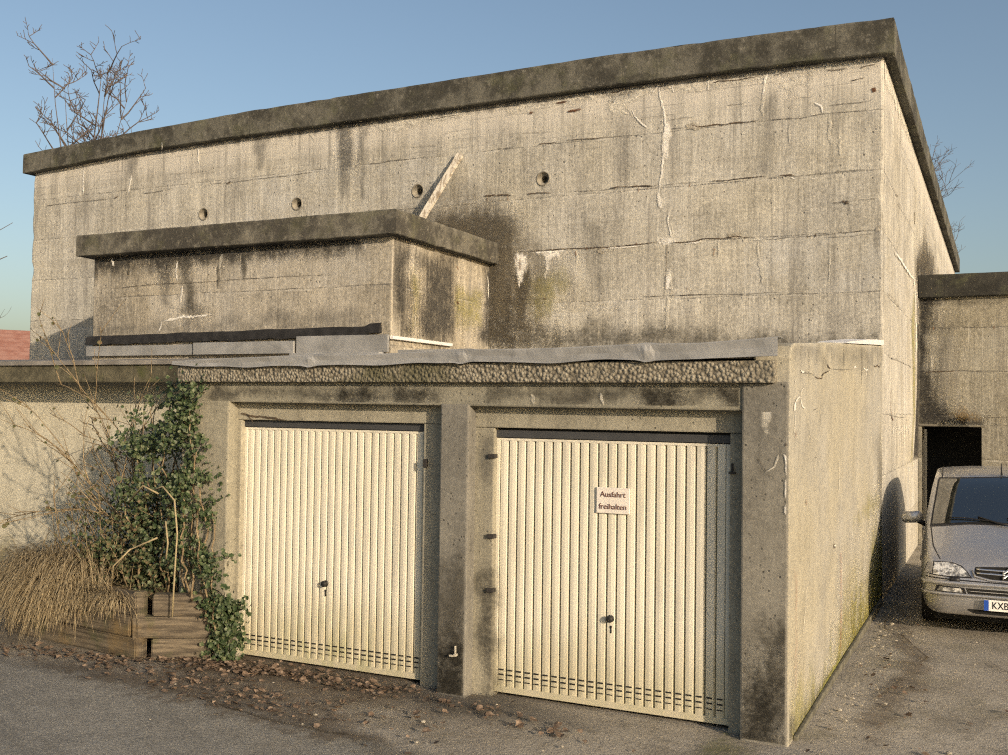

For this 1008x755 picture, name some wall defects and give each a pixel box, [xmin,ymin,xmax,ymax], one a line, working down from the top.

water stain [159,258,211,330]
water stain [480,269,490,343]
water stain [504,252,716,349]
water stain [893,253,982,458]
crack [785,357,1008,465]
water stain [741,625,797,742]